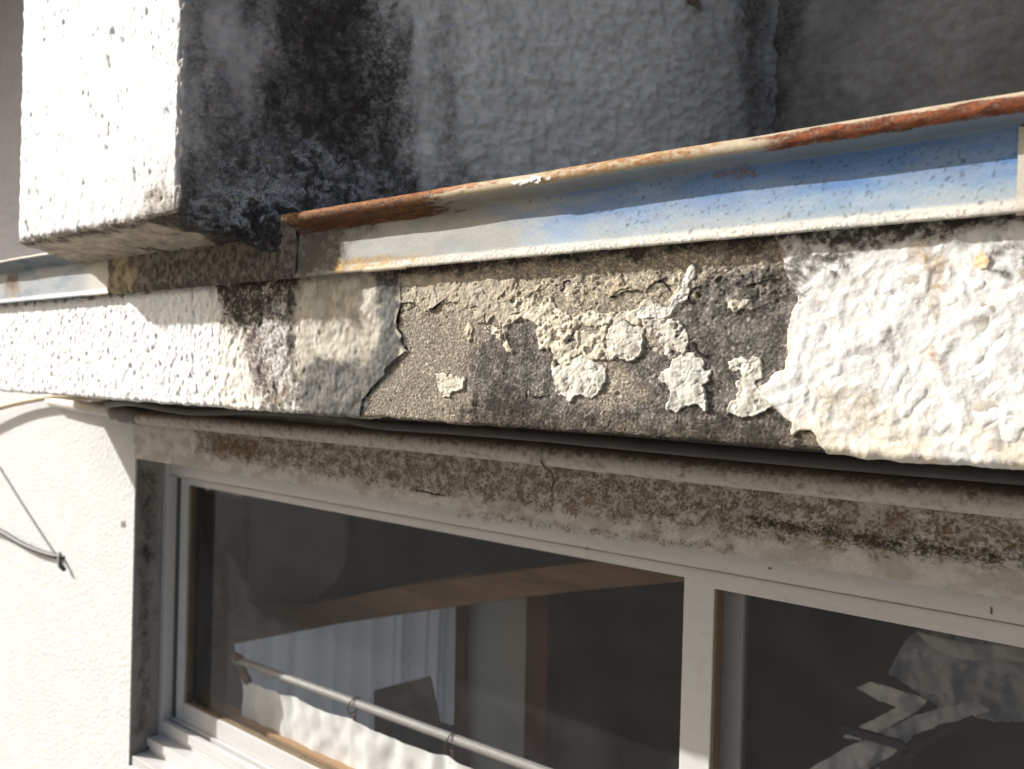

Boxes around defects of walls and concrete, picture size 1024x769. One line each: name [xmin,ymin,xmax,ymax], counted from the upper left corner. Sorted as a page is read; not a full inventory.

leakage [21,0,418,245]
corrosion [281,180,495,235]
corrosion [543,146,700,183]
corrosion [753,95,1024,151]
peeling [919,209,989,219]
leakage [216,270,406,419]
crack [359,299,445,418]
leakage [459,385,789,449]
peeling [362,217,904,451]
leakage [194,430,1024,569]